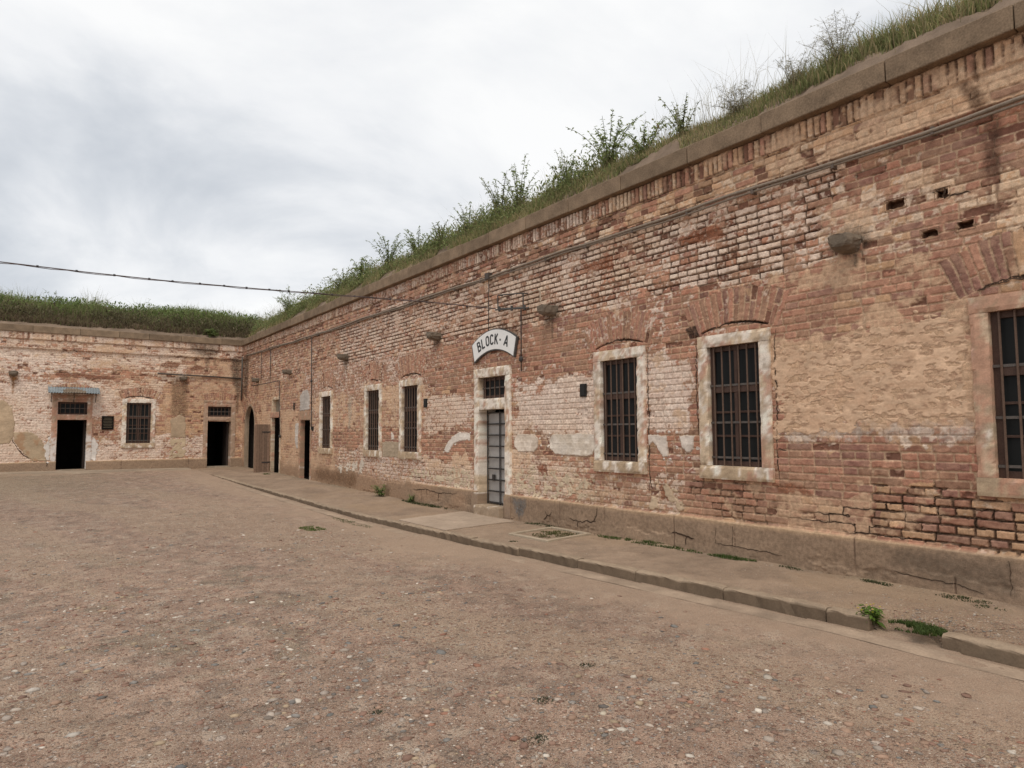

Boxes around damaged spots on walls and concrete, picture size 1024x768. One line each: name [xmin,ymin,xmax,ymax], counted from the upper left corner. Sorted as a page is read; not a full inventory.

peeling [335,458,365,475]
peeling [513,465,597,502]
spalling [772,483,811,495]
crack [672,527,775,555]
crack [795,496,1024,597]